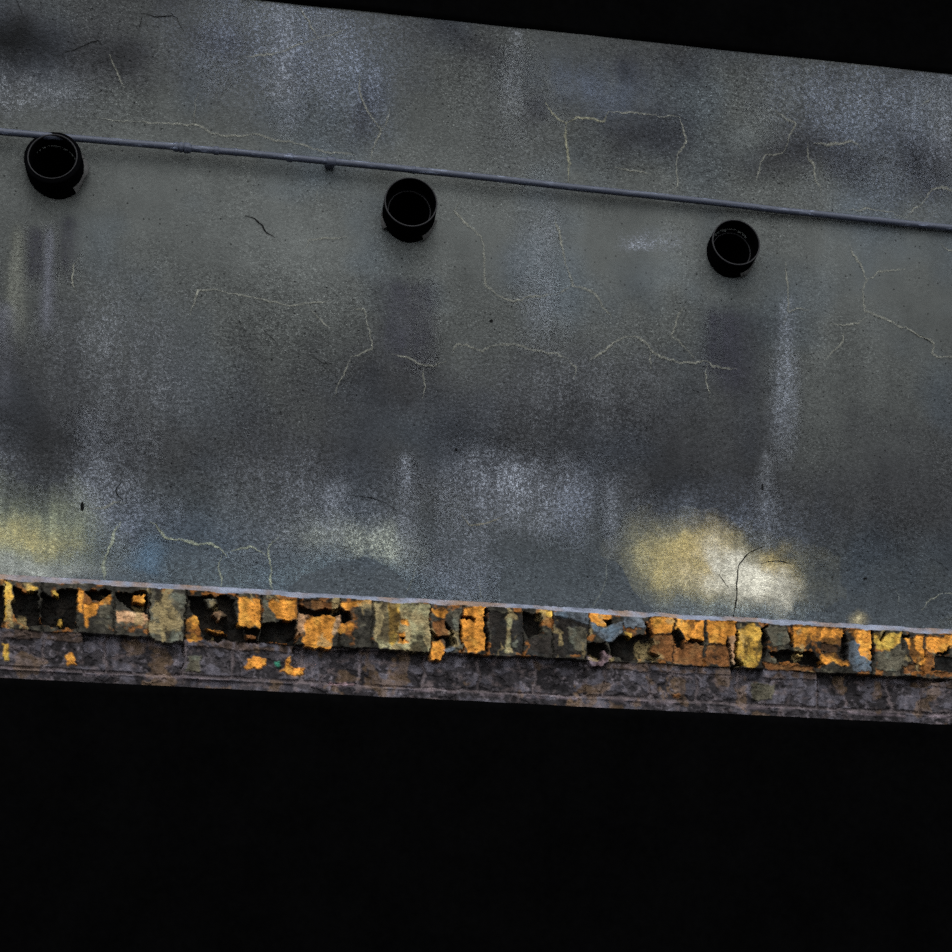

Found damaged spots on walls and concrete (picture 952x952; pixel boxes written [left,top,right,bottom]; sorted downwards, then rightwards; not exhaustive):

crack [551,111,645,176]
crack [641,316,718,391]
crack [831,305,944,357]
water stain [643,526,790,616]
spalling [0,581,952,678]